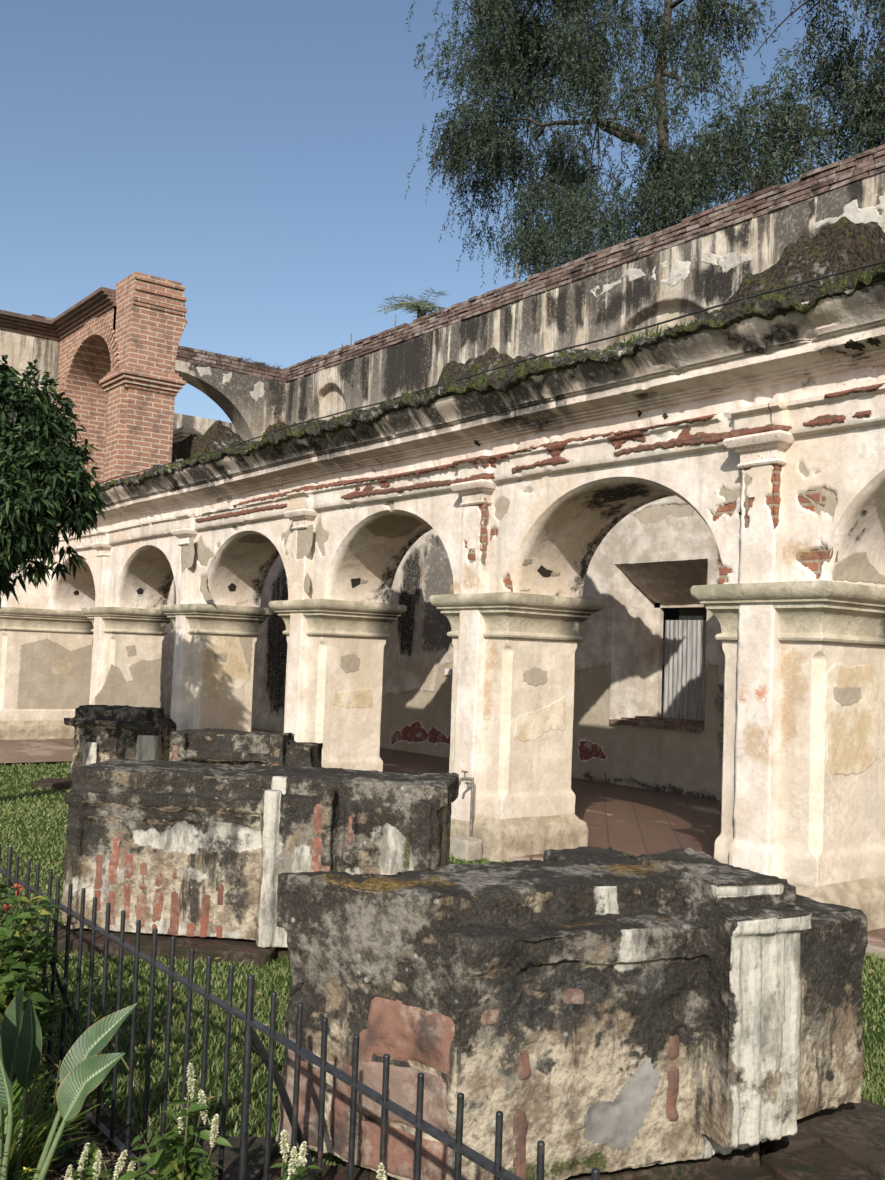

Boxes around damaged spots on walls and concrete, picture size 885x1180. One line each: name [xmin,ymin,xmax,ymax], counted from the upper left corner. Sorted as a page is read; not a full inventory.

peeling [811,193,885,230]
water stain [532,255,652,334]
water stain [690,220,751,305]
peeling [196,367,232,384]
water stain [382,328,441,399]
water stain [725,324,800,354]
flaking render [824,383,885,399]
flaking render [181,410,885,601]
water stain [241,550,288,712]
water stain [375,527,454,655]
peeling [380,662,453,758]
peeling [571,662,724,800]